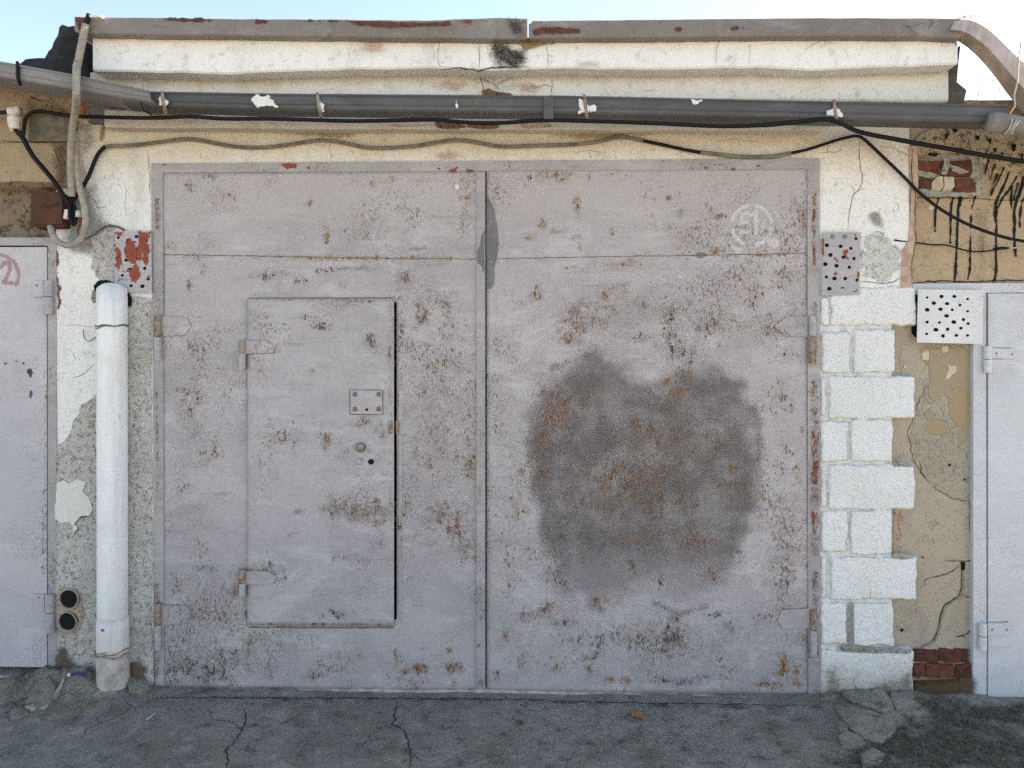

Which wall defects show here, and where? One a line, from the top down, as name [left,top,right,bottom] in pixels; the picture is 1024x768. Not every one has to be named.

crack [435,42,555,92]
crack [825,146,1024,288]
flaking render [915,128,1024,211]
flaking render [55,394,97,672]
corrosion [323,297,480,563]
corrosion [494,247,820,688]
peeling [892,512,904,553]
crack [907,383,970,531]
peeling [910,324,970,504]
crack [165,696,818,768]
flaking render [912,647,972,690]
crack [915,560,970,649]